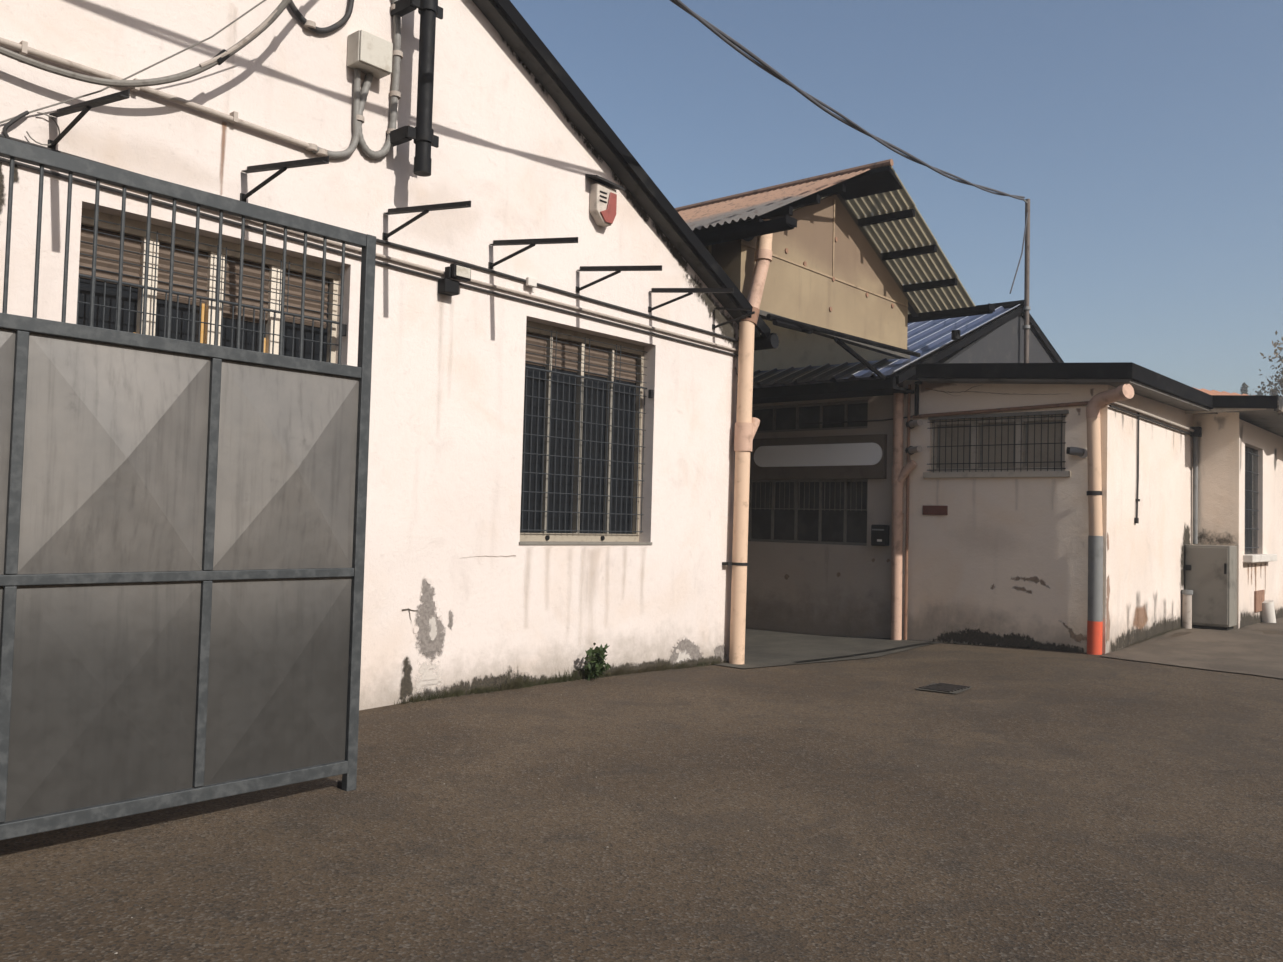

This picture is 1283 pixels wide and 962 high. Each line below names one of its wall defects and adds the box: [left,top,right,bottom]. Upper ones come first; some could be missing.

flaking render [1012,576,1049,594]
peeling [413,577,453,665]
water stain [400,657,584,703]
water stain [603,656,721,675]
flaking render [669,636,727,666]
water stain [933,629,1084,652]
water stain [1110,616,1182,651]